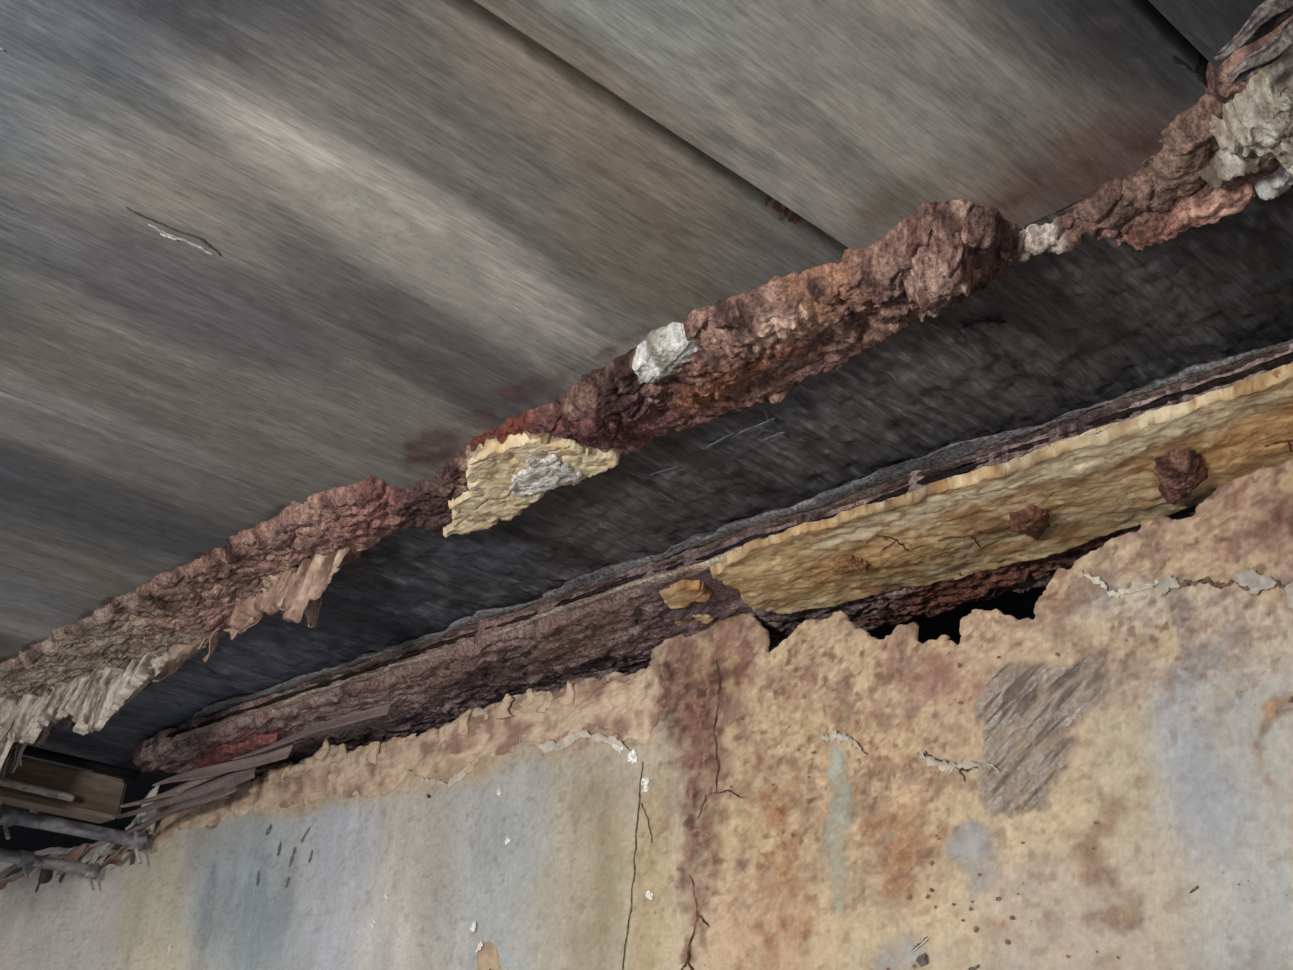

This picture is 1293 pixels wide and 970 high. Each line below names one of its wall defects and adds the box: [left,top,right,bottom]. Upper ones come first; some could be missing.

spalling [1200,0,1293,189]
peeling [304,597,322,628]
peeling [443,431,620,538]
rust [833,555,869,575]
peeling [659,364,1293,626]
peeling [0,714,73,777]
spalling [265,824,313,888]
peeling [129,664,665,865]
crack [622,762,653,970]
rust [648,649,728,926]
crack [681,875,709,970]
crack [697,659,743,819]